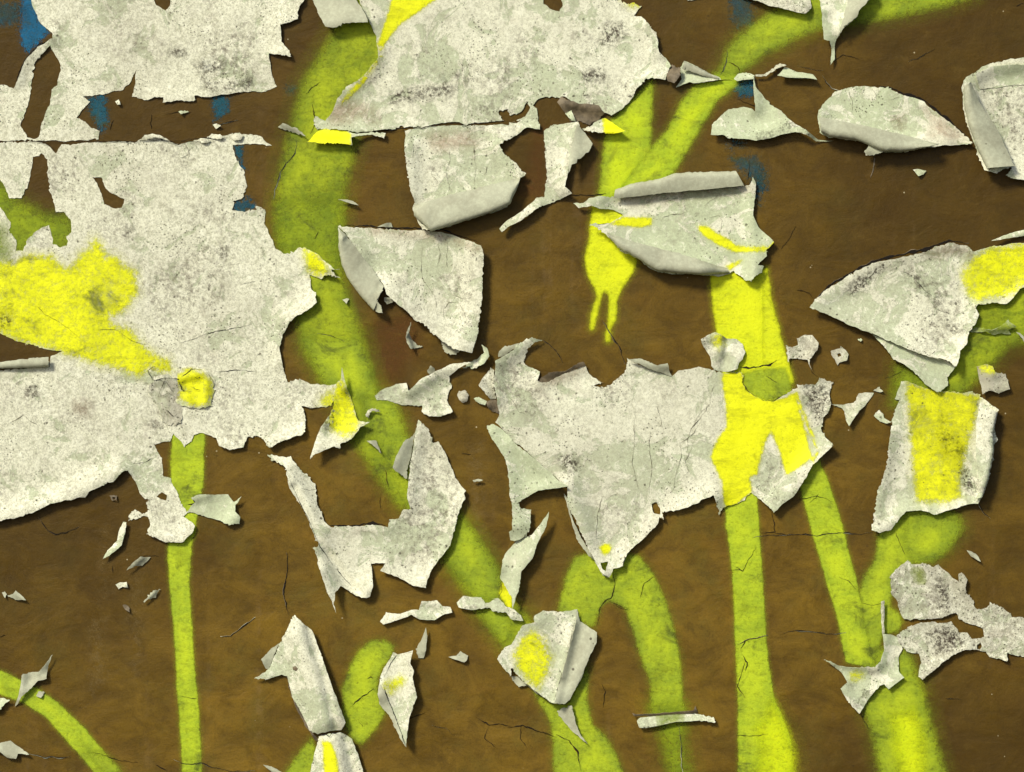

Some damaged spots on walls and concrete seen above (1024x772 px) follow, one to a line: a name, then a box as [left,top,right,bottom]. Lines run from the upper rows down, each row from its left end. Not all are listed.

peeling [711,57,1024,180]
peeling [573,171,774,282]
peeling [0,0,721,612]
peeling [810,230,1024,533]
peeling [375,332,883,746]
crack [737,512,862,572]
peeling [255,615,363,772]
crack [482,721,580,764]
peeling [826,560,1024,714]